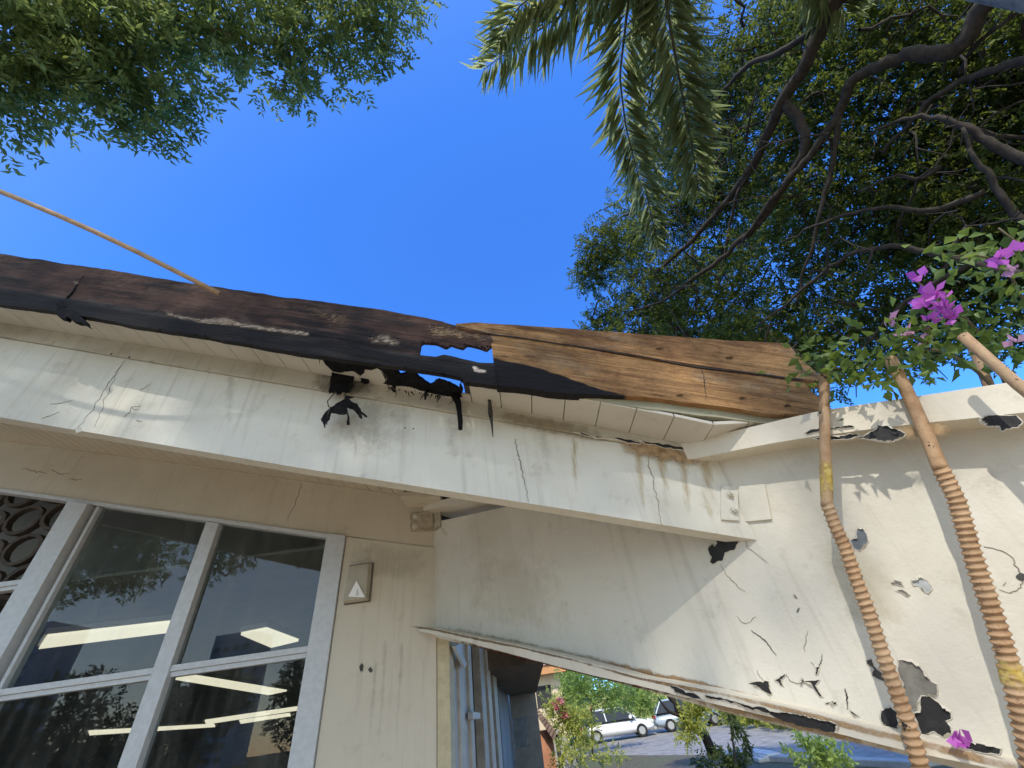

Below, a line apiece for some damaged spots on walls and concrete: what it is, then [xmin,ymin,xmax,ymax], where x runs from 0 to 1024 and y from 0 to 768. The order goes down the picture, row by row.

crack [41,363,150,427]
spalling [804,425,906,443]
spalling [978,414,1024,432]
crack [515,439,529,502]
rust [623,442,709,476]
spalling [707,540,740,565]
peeling [849,527,870,552]
peeling [890,575,933,596]
crack [984,546,1024,593]
spalling [669,657,860,733]
peeling [896,659,953,738]
peeling [879,705,900,729]